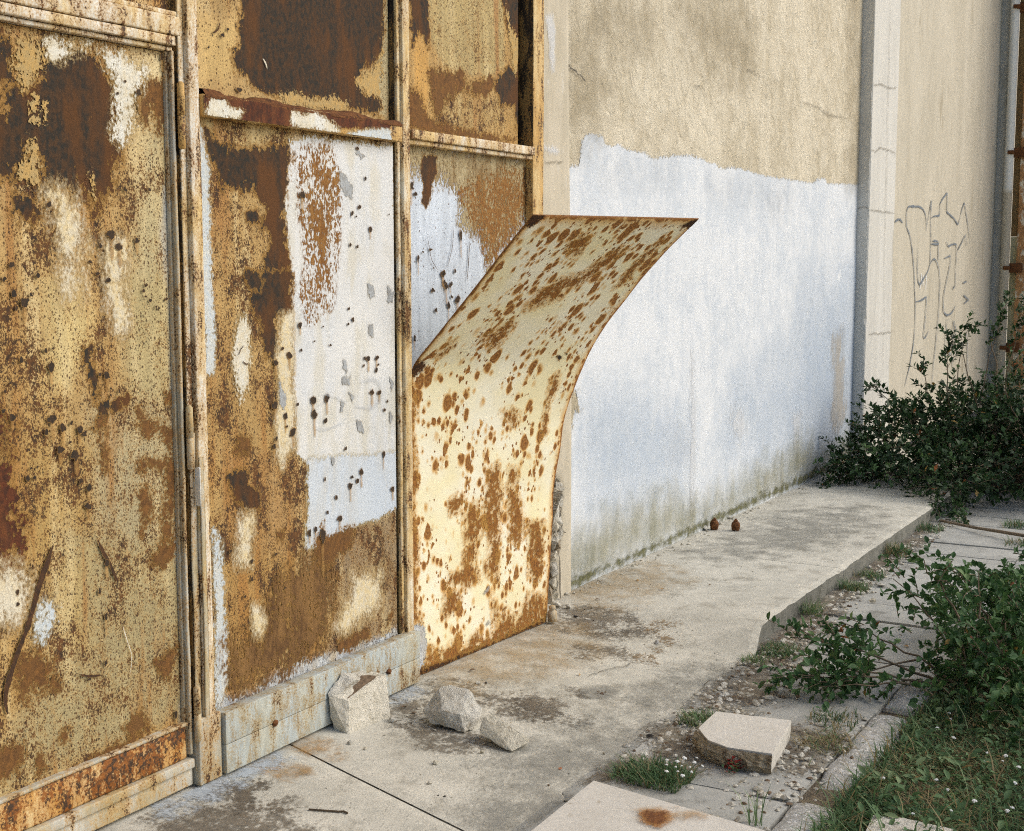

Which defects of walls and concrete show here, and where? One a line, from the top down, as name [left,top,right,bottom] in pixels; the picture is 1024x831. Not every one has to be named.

corrosion [0,35,125,228]
corrosion [199,0,518,369]
corrosion [0,405,29,581]
corrosion [81,343,177,570]
corrosion [226,434,262,515]
corrosion [218,519,370,702]
peeling [271,90,396,550]
corrosion [412,360,427,623]
corrosion [420,460,547,675]
corrosion [482,233,625,349]
leakage [687,505,888,559]
leakage [808,330,847,430]